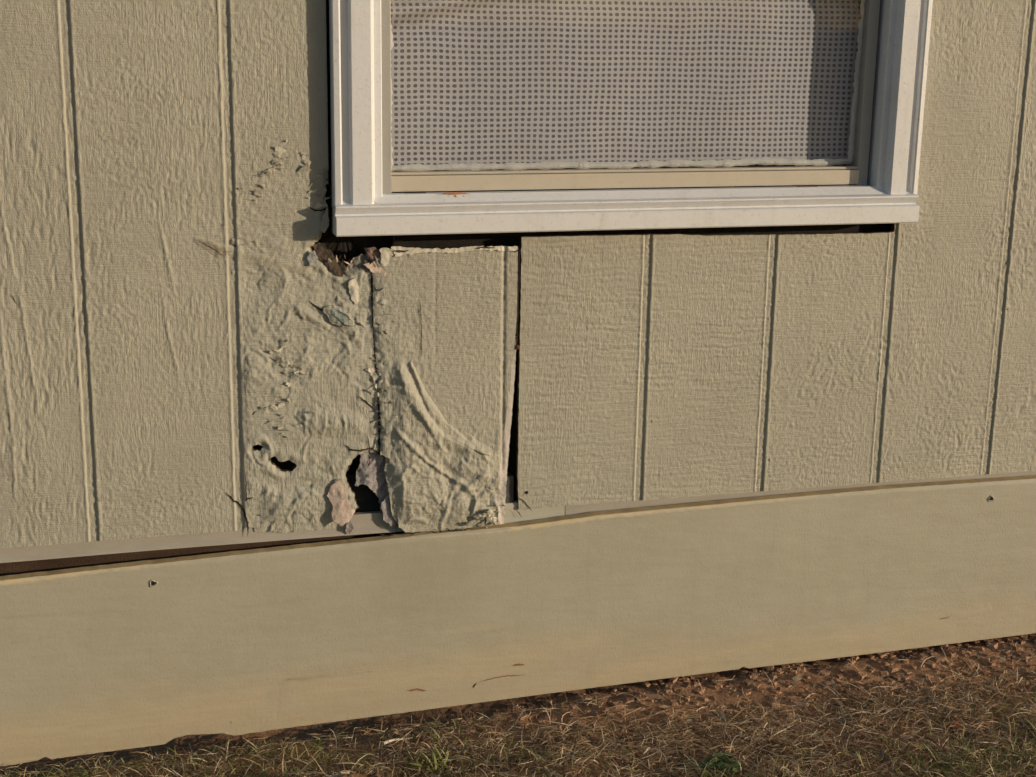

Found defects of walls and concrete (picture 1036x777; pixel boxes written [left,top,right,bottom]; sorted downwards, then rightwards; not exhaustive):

peeling [238,140,518,304]
peeling [253,339,332,438]
crack [345,272,390,469]
peeling [366,357,398,438]
peeling [326,479,356,526]